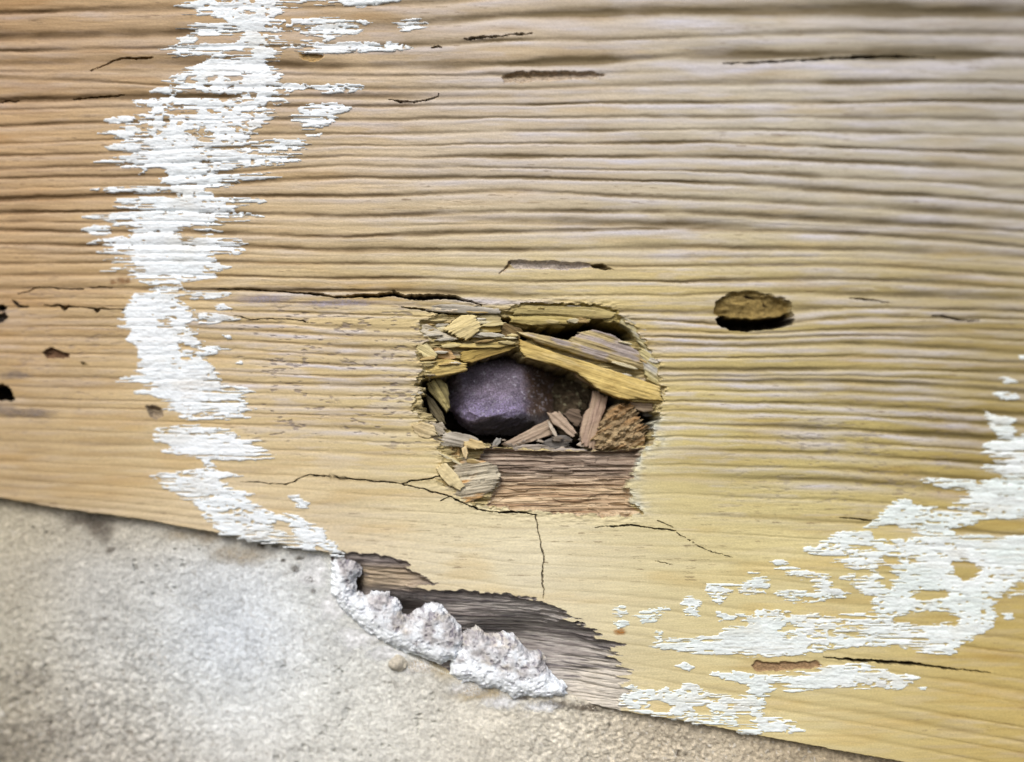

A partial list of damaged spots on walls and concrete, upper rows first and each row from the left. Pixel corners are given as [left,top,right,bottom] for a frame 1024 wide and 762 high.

crack [17,286,126,313]
peeling [81,0,429,557]
spalling [411,302,668,518]
peeling [993,377,1020,400]
damp [259,544,449,674]
crack [240,474,545,599]
crack [595,520,733,558]
peeling [612,409,1024,735]
damp [452,683,557,712]